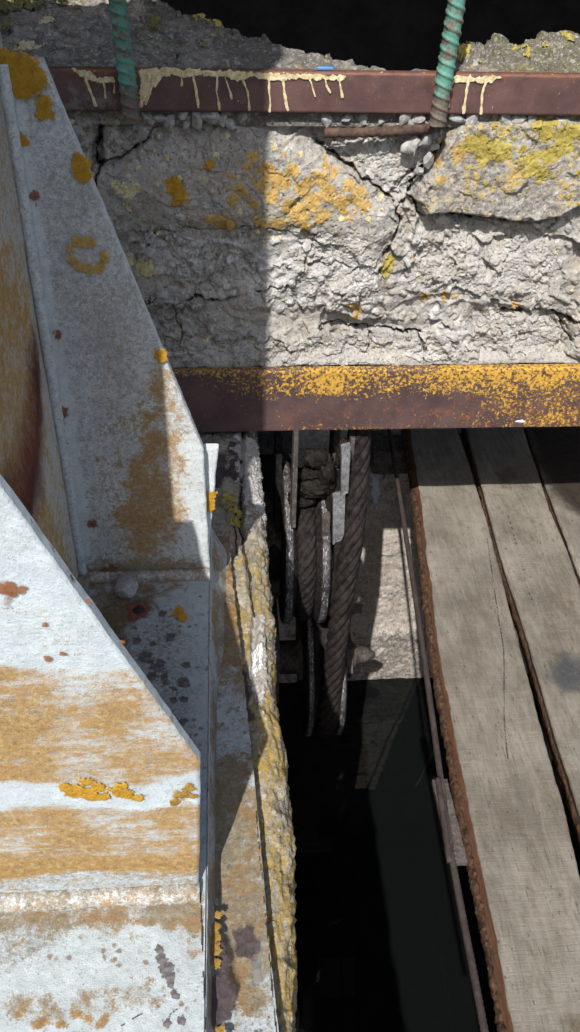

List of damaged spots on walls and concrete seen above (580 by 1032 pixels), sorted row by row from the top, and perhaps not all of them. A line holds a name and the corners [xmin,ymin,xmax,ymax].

spalling [0,0,117,67]
spalling [126,0,386,70]
spalling [455,30,580,73]
crack [95,124,153,188]
crack [315,139,443,259]
crack [449,212,506,221]
crack [319,319,422,342]
crack [500,306,580,341]
corrosion [5,337,44,516]